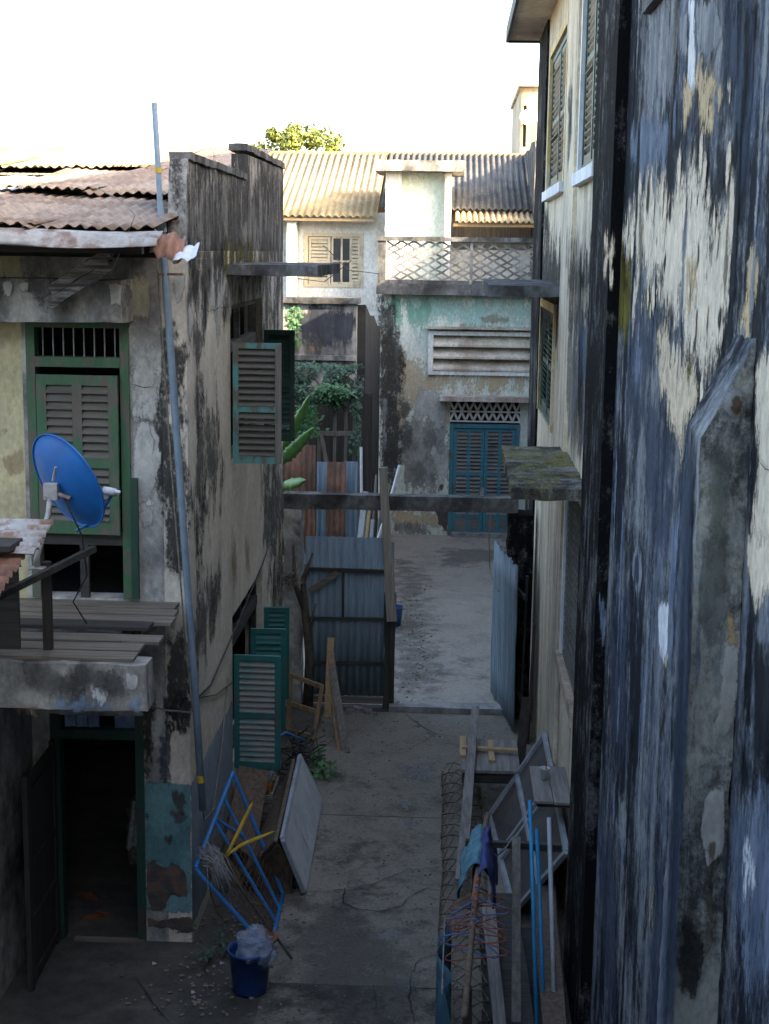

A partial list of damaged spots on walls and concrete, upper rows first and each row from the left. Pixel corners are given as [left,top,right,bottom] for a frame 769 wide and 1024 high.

peeling [603,51,759,463]
leakage [140,140,285,783]
leakage [377,295,431,494]
peeling [733,346,769,614]
leakage [23,663,124,704]
peeling [714,612,740,740]
spalling [146,860,194,933]
spalling [170,790,187,823]
peeling [700,786,725,951]